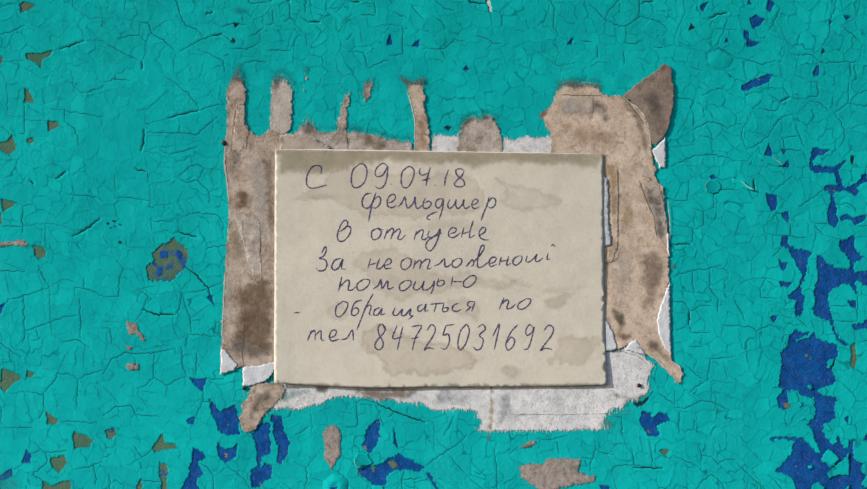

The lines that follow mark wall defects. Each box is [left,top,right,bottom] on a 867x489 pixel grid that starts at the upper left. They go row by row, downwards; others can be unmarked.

peeling [810,148,867,227]
peeling [146,238,189,282]
crack [0,0,486,489]
crack [476,0,867,489]
peeling [771,236,867,489]
peeling [43,456,71,489]
peeling [182,448,205,489]
peeling [210,400,240,463]
peeling [251,415,290,487]
peeling [354,420,438,489]
crack [296,399,564,489]
peeling [634,398,670,437]